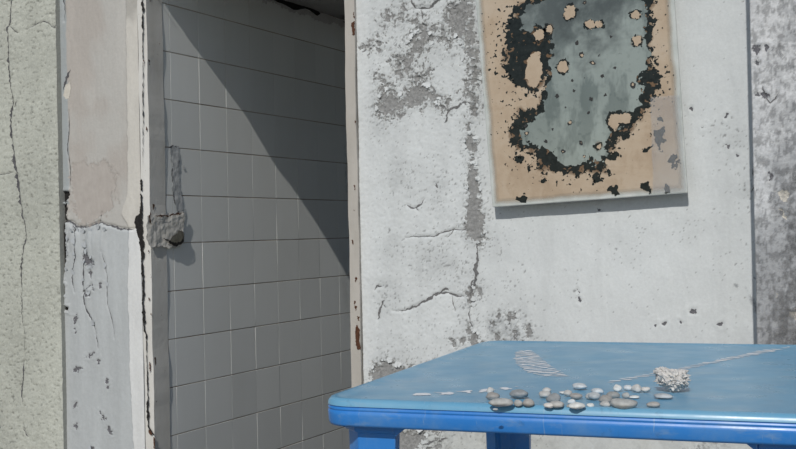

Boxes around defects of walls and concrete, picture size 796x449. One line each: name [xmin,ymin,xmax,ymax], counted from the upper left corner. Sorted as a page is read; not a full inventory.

crack [0,0,65,323]
spalling [134,179,143,260]
peeling [169,145,186,224]
spalling [358,0,489,308]
crack [406,229,473,238]
crack [375,285,478,344]
spalling [368,357,415,381]
spalling [399,430,446,449]